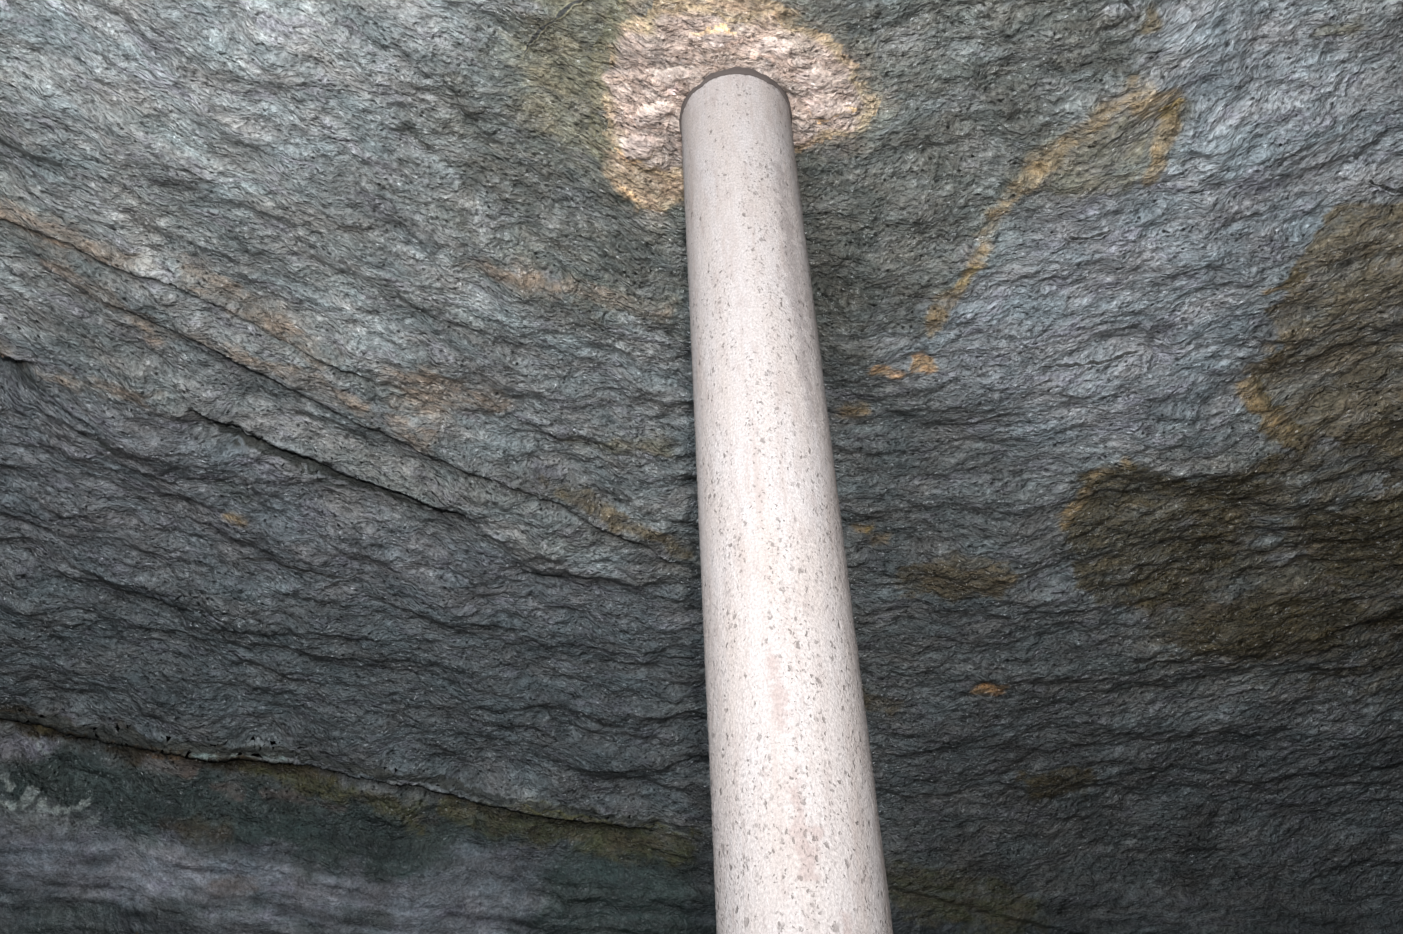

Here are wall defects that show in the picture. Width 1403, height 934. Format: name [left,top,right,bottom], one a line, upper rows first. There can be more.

spalling [594,0,883,213]
crack [1121,0,1138,18]
corrosion [857,71,1205,383]
corrosion [828,397,877,424]